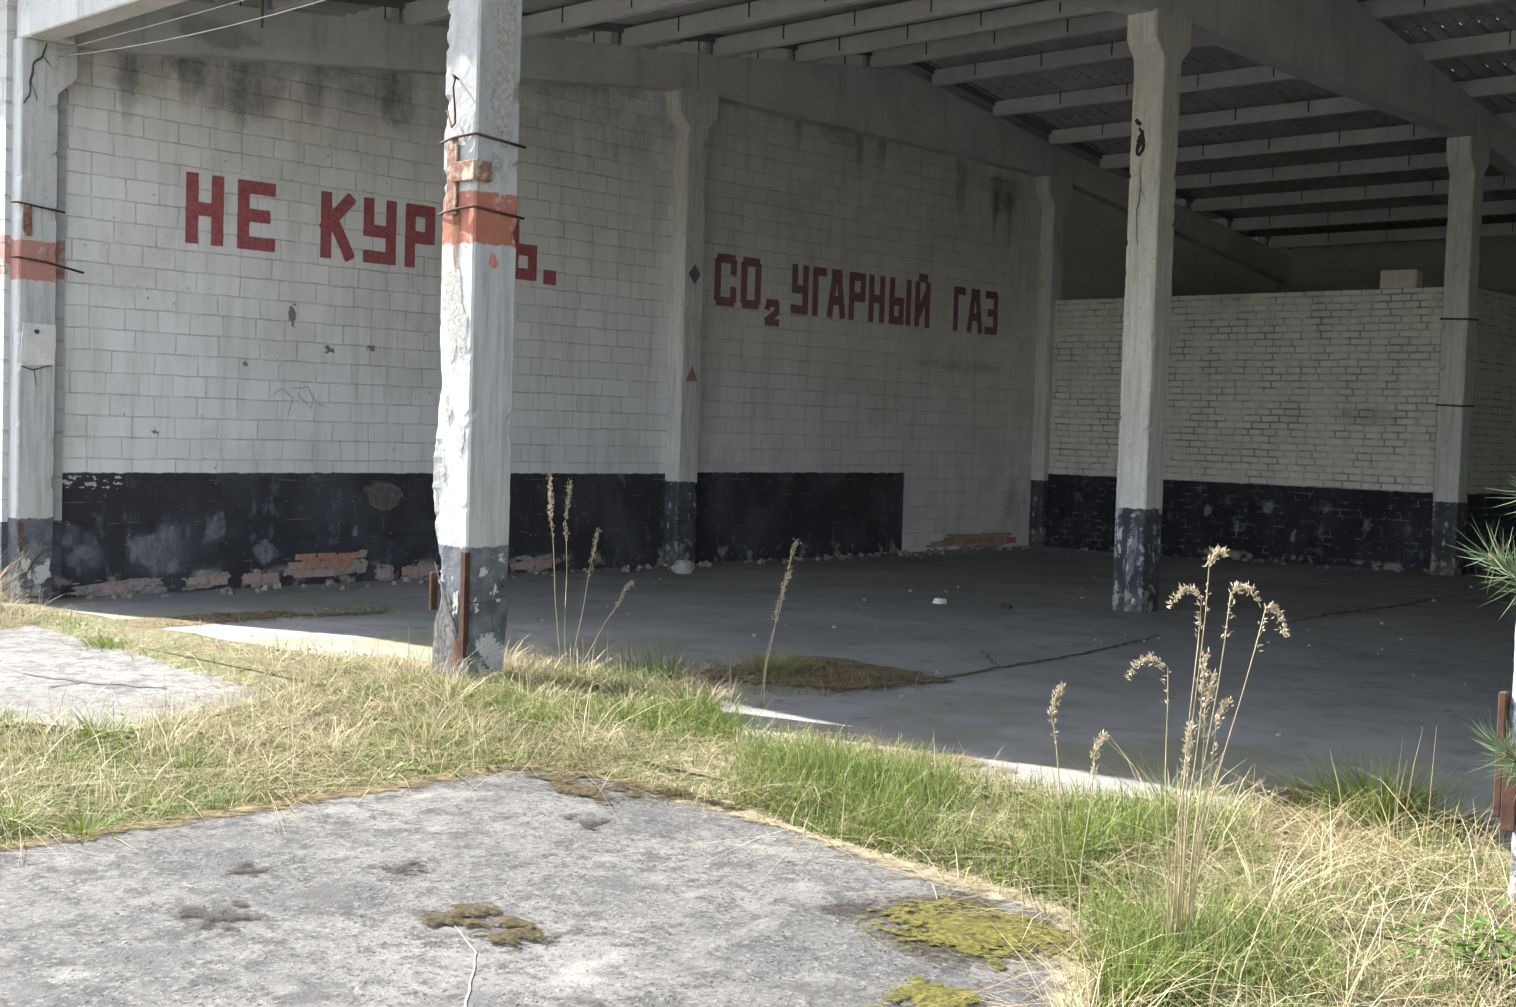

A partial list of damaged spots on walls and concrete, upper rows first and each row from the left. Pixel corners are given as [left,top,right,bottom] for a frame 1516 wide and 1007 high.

corrosion [452,210,460,263]
peeling [442,257,468,364]
peeling [205,514,226,540]
spalling [16,523,558,683]
corrosion [452,552,470,679]
crack [895,635,1161,684]
crack [1285,592,1481,623]
corrosion [1492,691,1516,832]